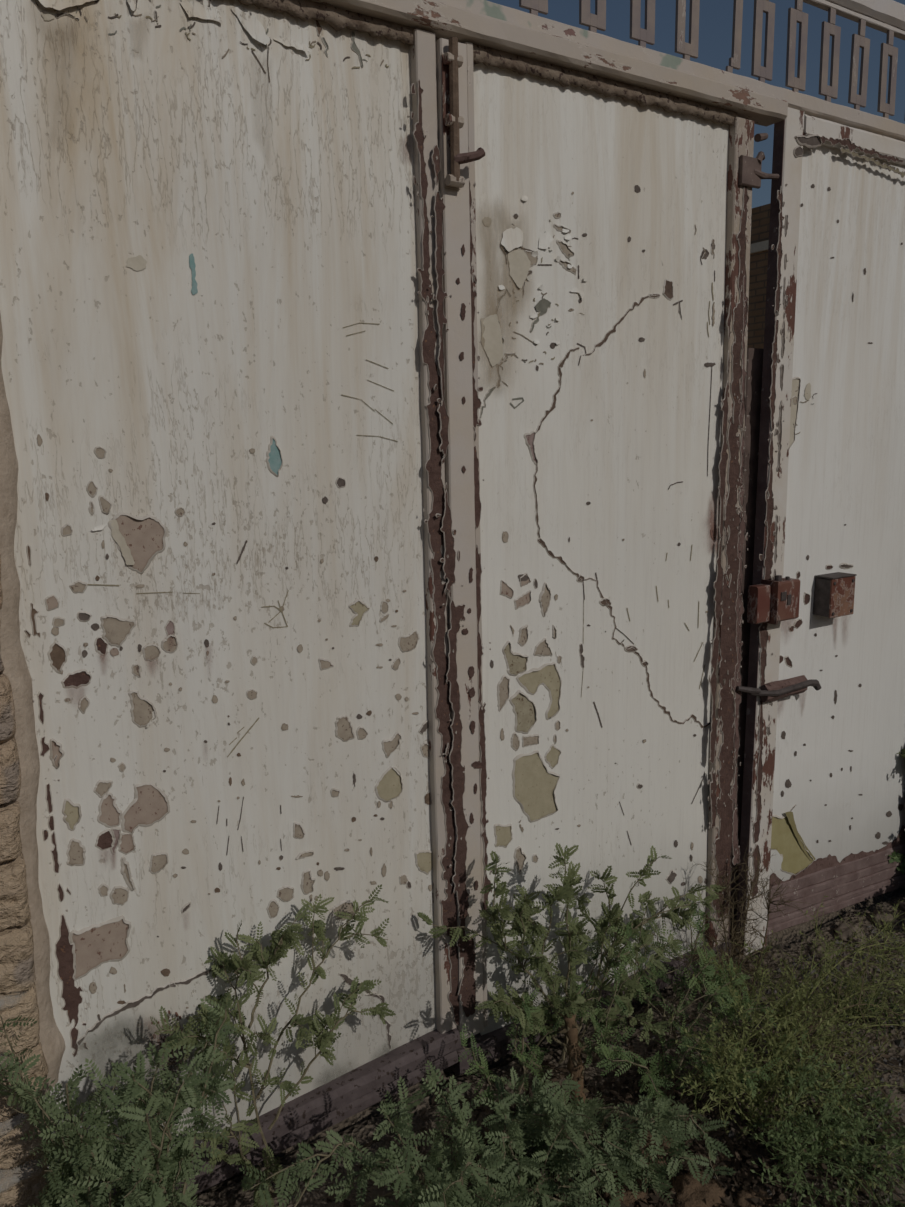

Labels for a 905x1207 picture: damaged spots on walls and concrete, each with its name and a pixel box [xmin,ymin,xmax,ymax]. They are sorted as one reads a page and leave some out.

corrosion [24,602,41,638]
corrosion [33,691,57,761]
peeling [45,595,178,728]
corrosion [42,777,187,1089]
peeling [62,758,170,1004]
peeling [86,480,167,588]
crack [76,951,267,1046]
corrosion [407,79,492,1026]
peeling [490,573,569,874]
crack [524,279,711,728]
peeling [770,779,831,876]
corrosion [707,183,905,919]